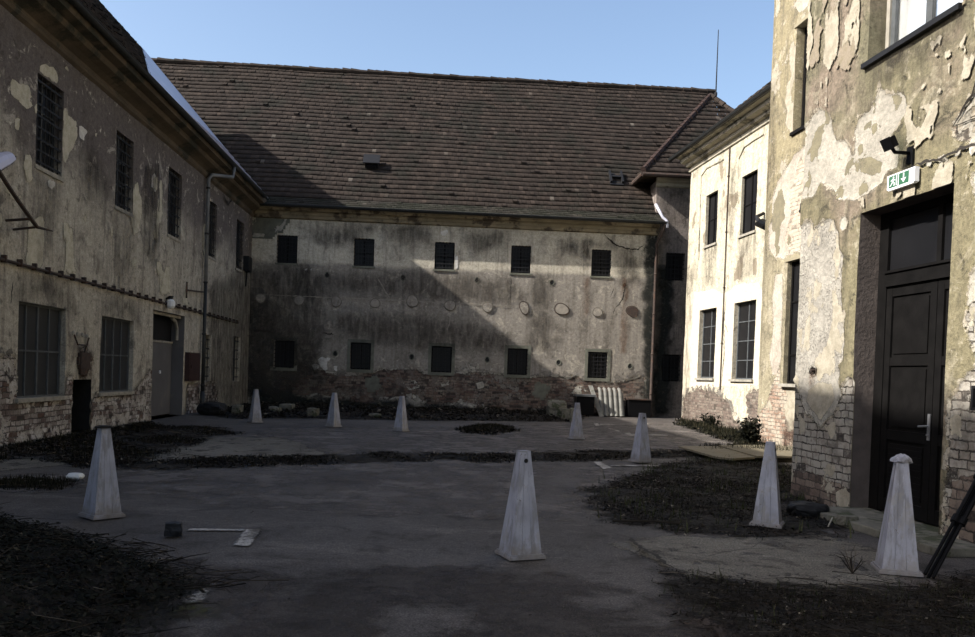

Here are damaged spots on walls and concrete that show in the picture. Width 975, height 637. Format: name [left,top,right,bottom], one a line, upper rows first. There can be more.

peeling [0,76,37,113]
peeling [40,64,68,83]
peeling [930,13,975,80]
peeling [24,154,33,183]
peeling [62,108,97,162]
peeling [932,160,953,189]
spalling [951,89,975,195]
spalling [681,0,941,507]
leakage [206,268,509,411]
spalling [0,346,93,446]